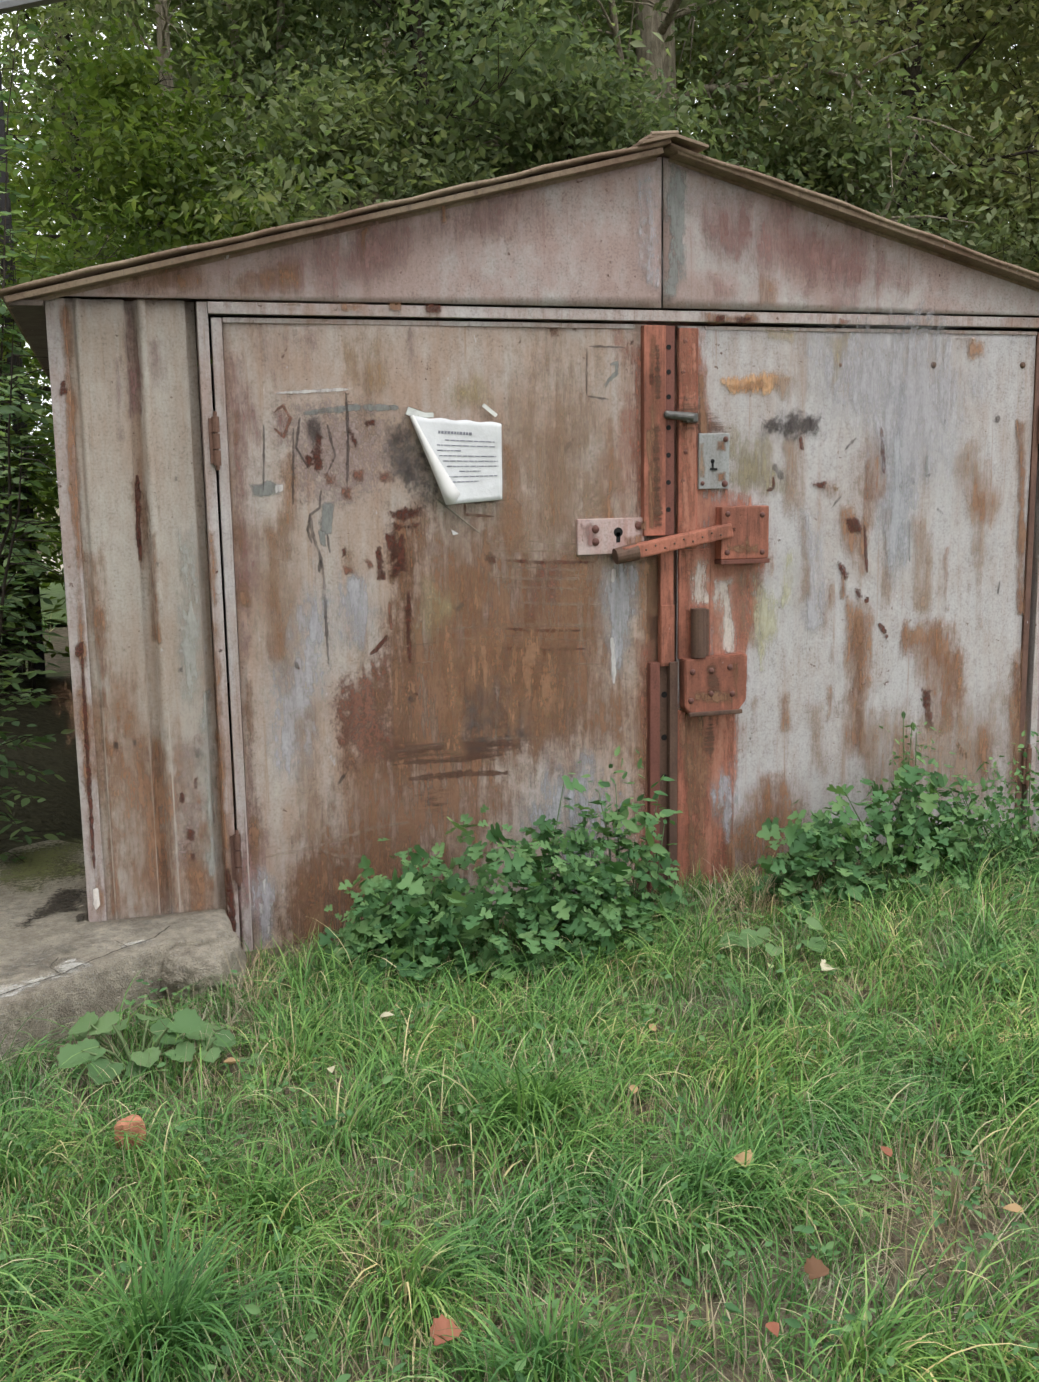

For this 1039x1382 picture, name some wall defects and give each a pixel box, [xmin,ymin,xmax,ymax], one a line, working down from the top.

corrosion [60,306,663,946]
corrosion [426,303,441,313]
corrosion [678,312,764,655]
corrosion [678,704,801,888]
corrosion [829,420,1026,796]
corrosion [969,338,984,357]